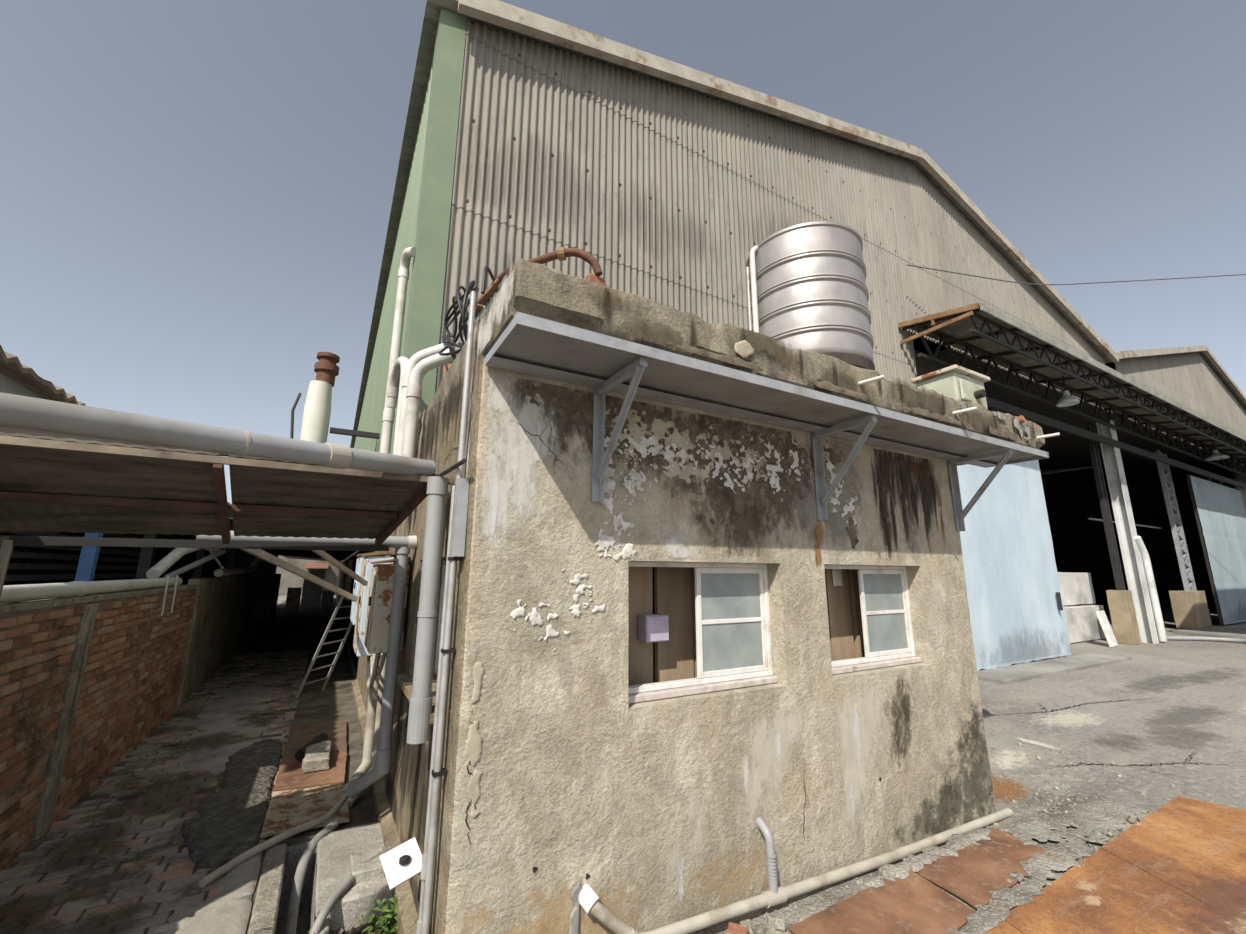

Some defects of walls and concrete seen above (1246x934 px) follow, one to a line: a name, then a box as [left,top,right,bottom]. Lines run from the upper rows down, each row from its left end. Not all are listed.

spalling [516,380,861,562]
corrosion [814,524,824,566]
damp [872,448,945,558]
peeling [510,569,612,655]
crack [465,761,478,851]